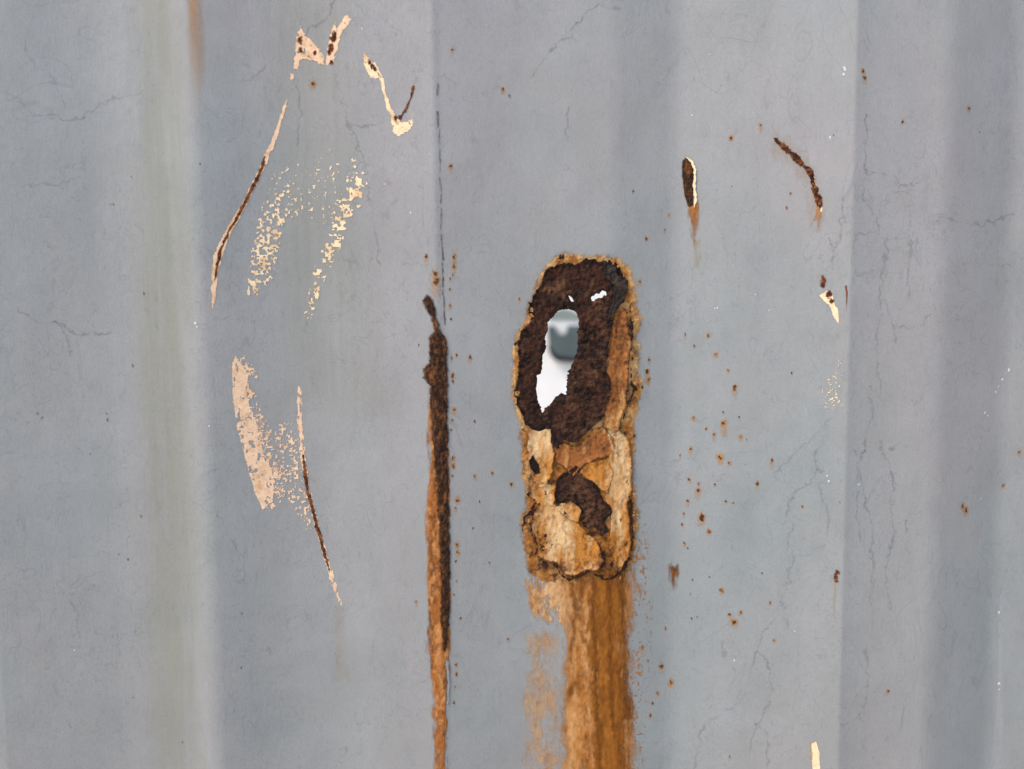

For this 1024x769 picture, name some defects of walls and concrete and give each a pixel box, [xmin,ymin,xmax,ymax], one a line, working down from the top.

peeling [247,148,368,318]
corrosion [682,157,699,235]
peeling [819,275,839,323]
peeling [232,355,315,529]
corrosion [414,254,472,769]
corrosion [510,254,663,769]